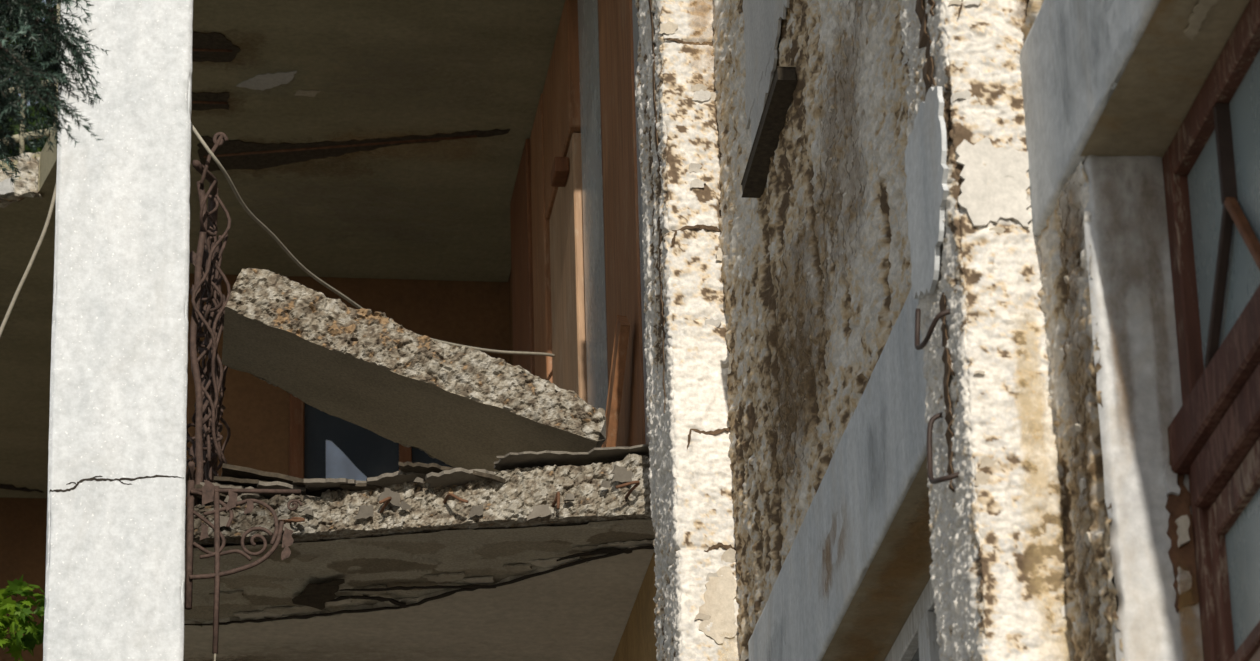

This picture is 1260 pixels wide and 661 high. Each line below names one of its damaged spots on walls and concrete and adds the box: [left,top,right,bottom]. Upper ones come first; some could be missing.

spalling [0,152,44,208]
spalling [184,0,1125,661]
crack [0,475,182,493]
spalling [1163,455,1199,612]